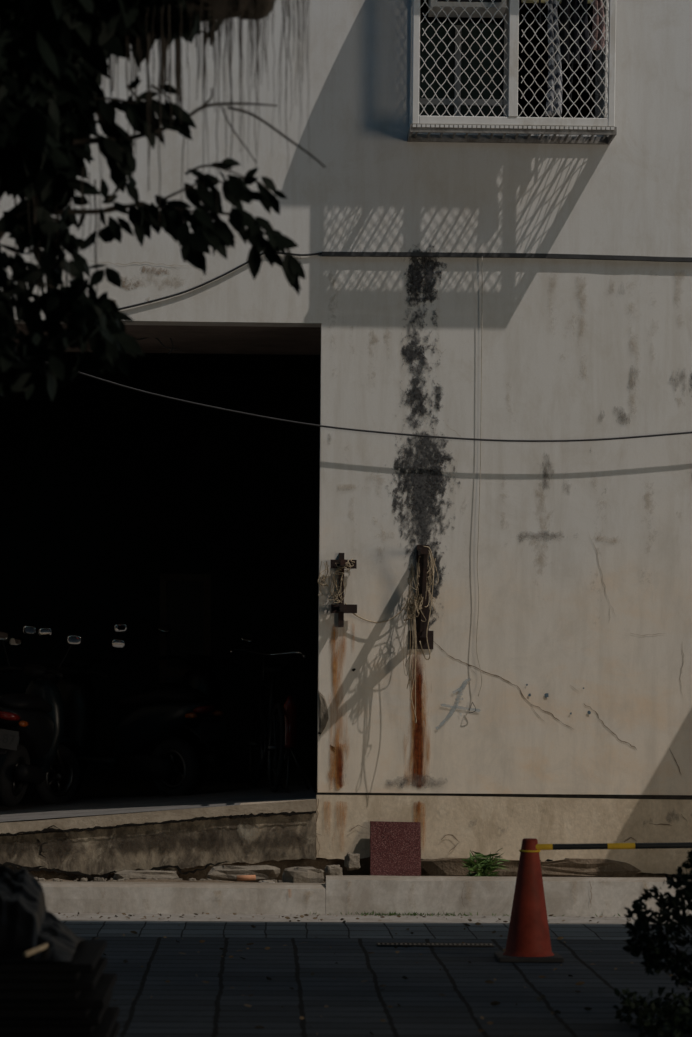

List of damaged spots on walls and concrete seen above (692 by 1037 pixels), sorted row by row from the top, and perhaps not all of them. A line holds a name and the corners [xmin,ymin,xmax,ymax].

water stain [392,245,455,626]
rust [331,728,343,789]
rust [333,630,354,708]
rust [411,660,430,787]
crack [435,643,573,729]
crack [572,686,637,750]